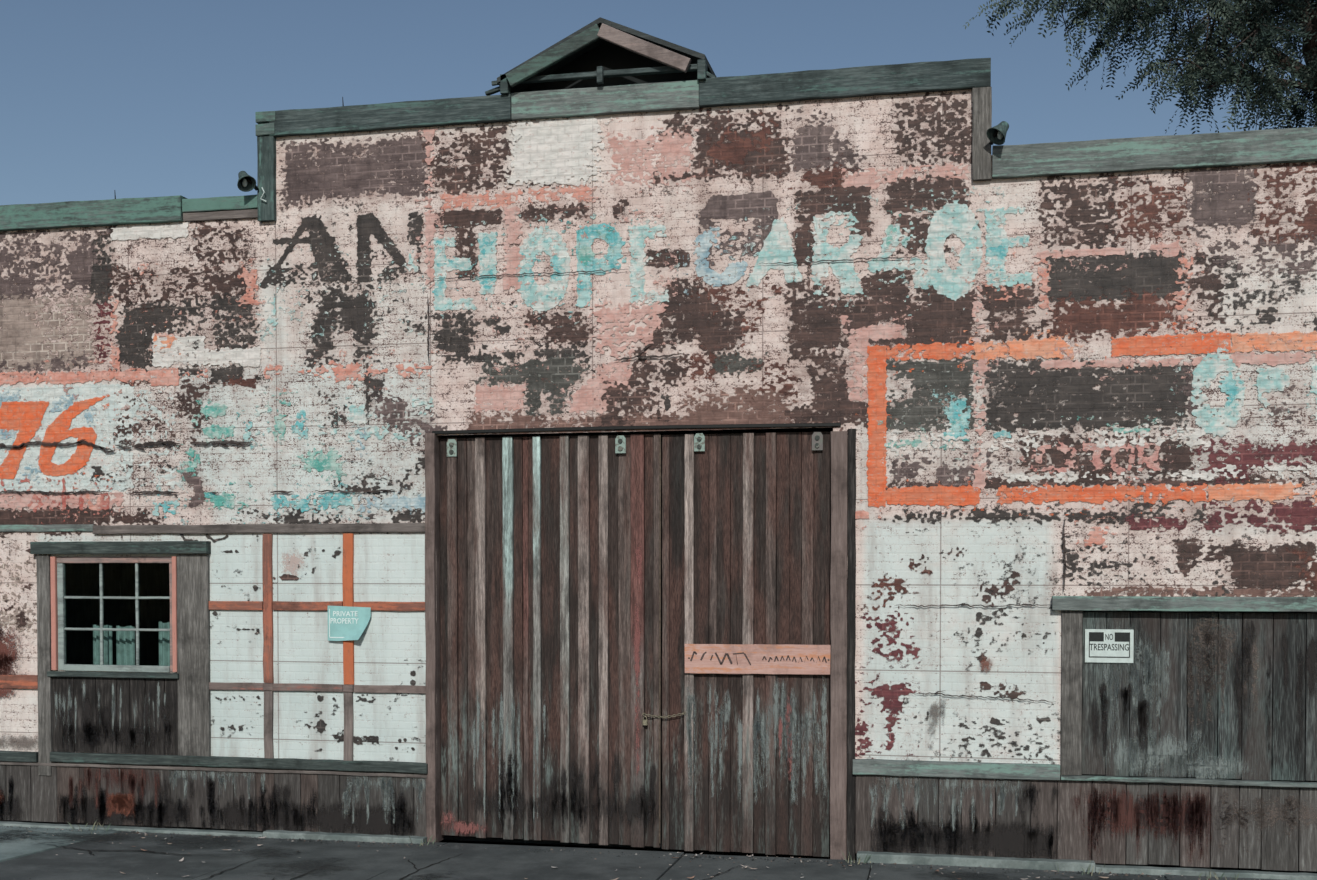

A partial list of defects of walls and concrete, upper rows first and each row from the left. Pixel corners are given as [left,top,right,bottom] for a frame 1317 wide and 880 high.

peeling [0,91,1317,764]
rust [0,627,21,698]
leakage [0,770,425,877]
crack [399,853,463,880]
leakage [473,693,661,832]
leakage [687,682,828,804]
leakage [870,777,1058,859]
leakage [1091,623,1255,779]